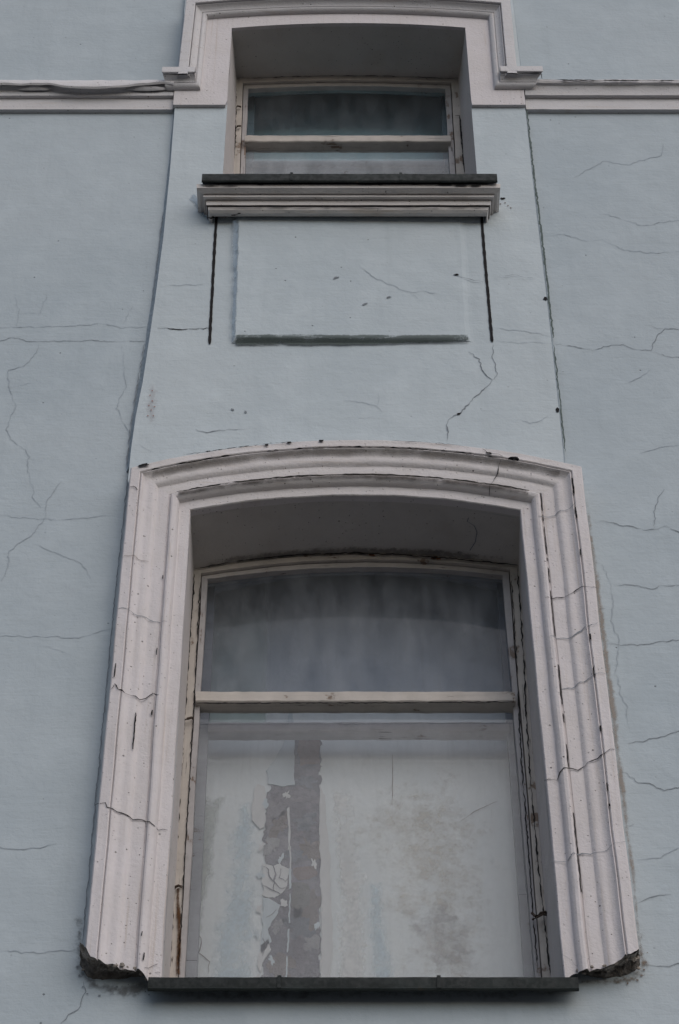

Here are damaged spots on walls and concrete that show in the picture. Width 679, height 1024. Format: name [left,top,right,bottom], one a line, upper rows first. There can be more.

crack [0,298,679,780]
crack [94,802,166,830]
crack [553,813,634,892]
spalling [79,942,147,981]
spalling [575,951,641,978]